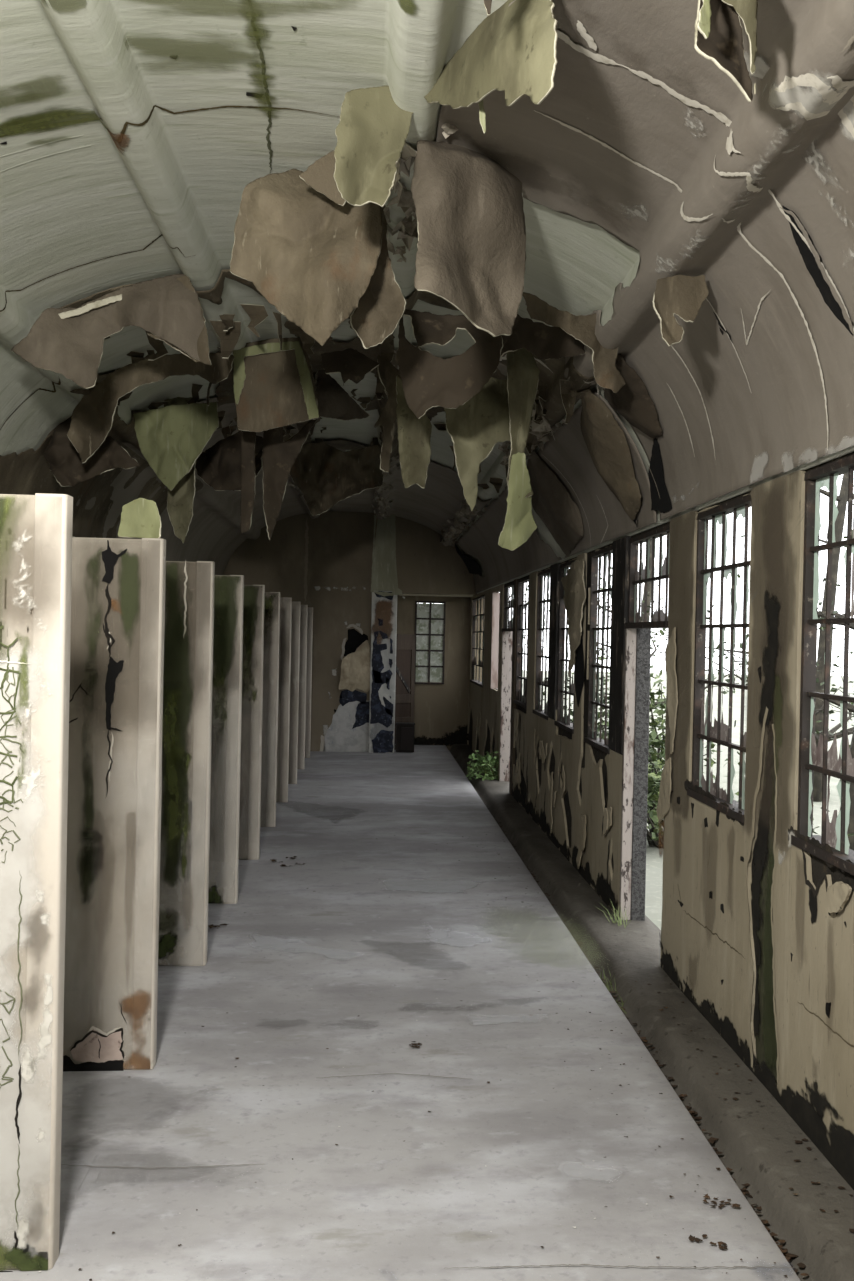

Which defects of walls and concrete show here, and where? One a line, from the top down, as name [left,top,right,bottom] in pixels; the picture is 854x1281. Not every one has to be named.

damp [0,77,108,143]
peeling [11,85,625,551]
peeling [424,0,558,134]
crack [534,110,828,457]
crack [556,21,854,331]
peeling [694,0,758,103]
damp [0,496,14,527]
crack [101,540,127,798]
damp [162,563,192,885]
peeling [320,591,405,753]
crack [0,625,24,1249]
damp [0,637,51,1251]